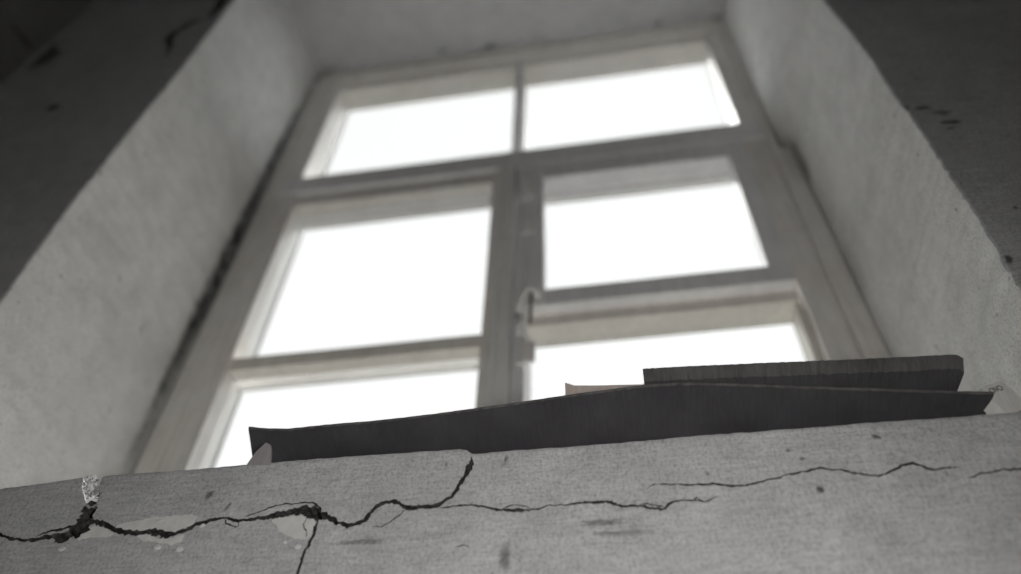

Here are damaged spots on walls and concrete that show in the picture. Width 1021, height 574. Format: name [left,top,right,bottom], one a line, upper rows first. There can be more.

crack [0,457,1021,574]